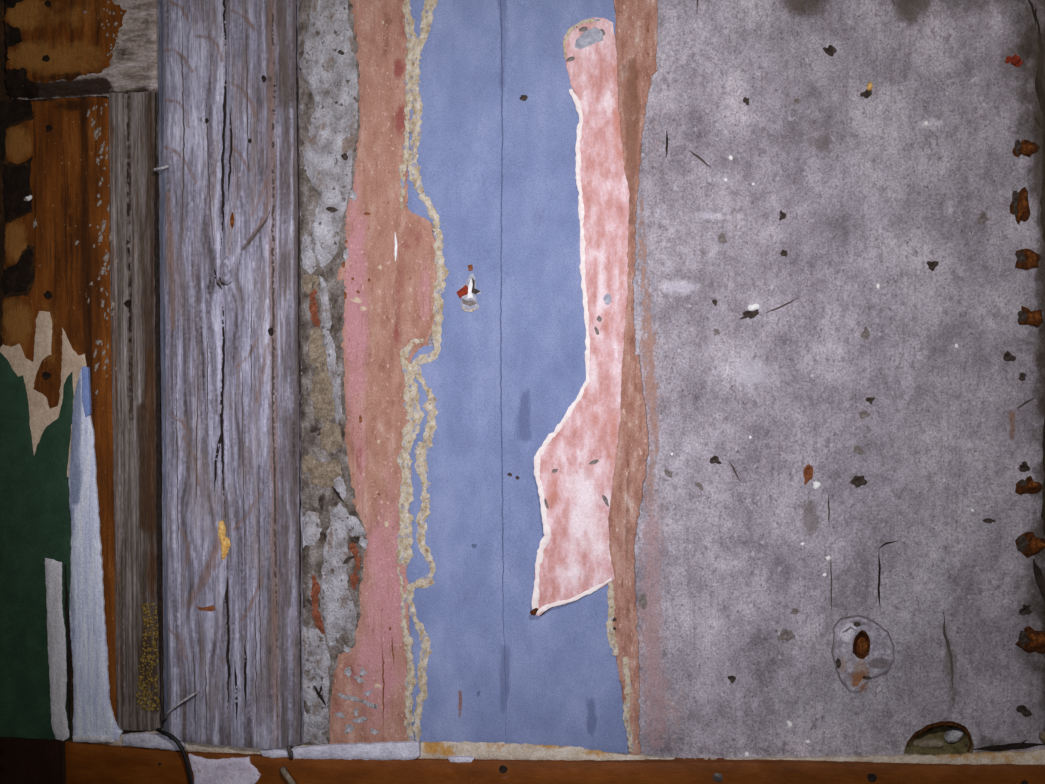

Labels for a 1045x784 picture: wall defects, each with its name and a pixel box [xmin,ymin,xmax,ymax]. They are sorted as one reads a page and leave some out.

peeling [0,95,118,741]
peeling [4,0,127,83]
crack [127,0,326,742]
flaking render [298,0,382,745]
peeling [384,0,481,741]
peeling [530,17,649,752]